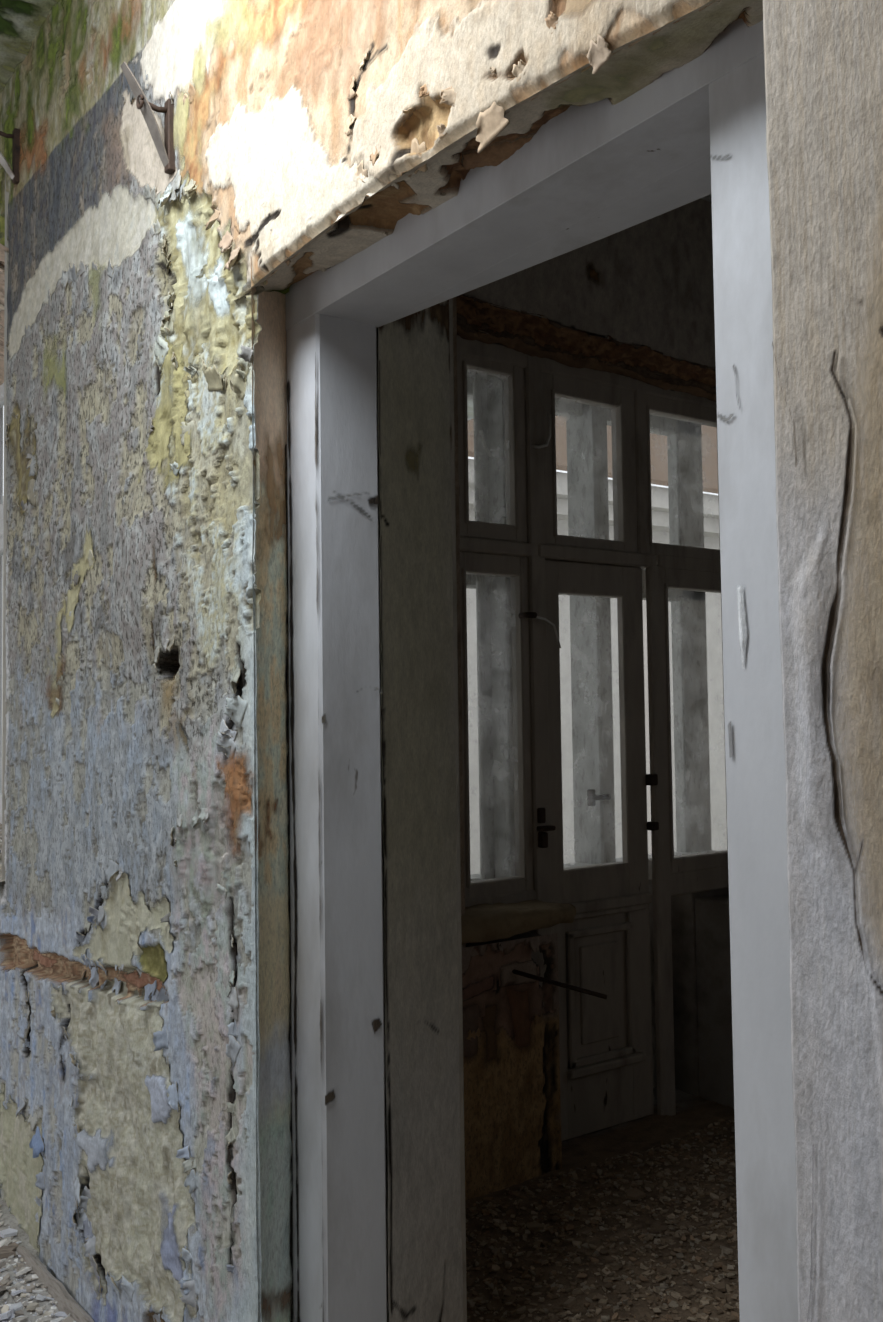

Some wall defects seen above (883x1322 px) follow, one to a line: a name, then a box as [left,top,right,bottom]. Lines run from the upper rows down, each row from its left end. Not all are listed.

peeling [5,402,38,516]
peeling [46,531,96,718]
flaking render [151,617,180,701]
peeling [0,0,719,487]
crack [821,351,883,995]
peeling [0,859,199,1322]